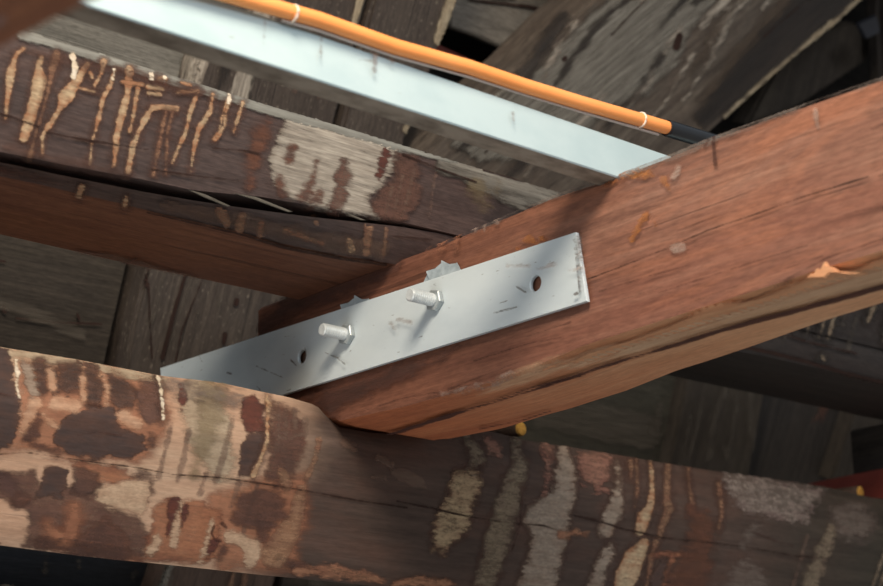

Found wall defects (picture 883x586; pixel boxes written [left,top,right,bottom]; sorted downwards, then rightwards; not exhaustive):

crack [0,113,225,180]
crack [402,150,520,183]
crack [704,136,717,166]
crack [654,174,883,282]
crack [386,284,883,435]
crack [56,456,474,518]
crack [495,515,824,558]